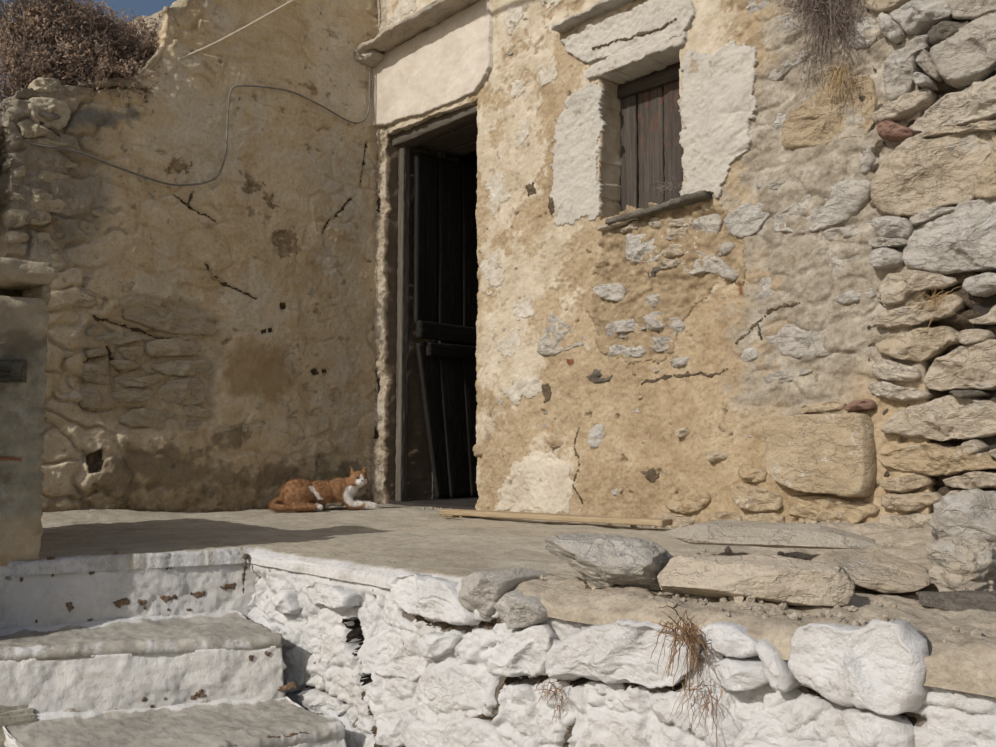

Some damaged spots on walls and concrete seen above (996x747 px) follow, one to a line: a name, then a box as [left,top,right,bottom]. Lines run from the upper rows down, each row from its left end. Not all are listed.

crack [174,193,216,222]
crack [322,143,368,233]
crack [205,264,257,299]
crack [83,315,164,371]
crack [572,427,583,504]
peeling [113,598,147,609]